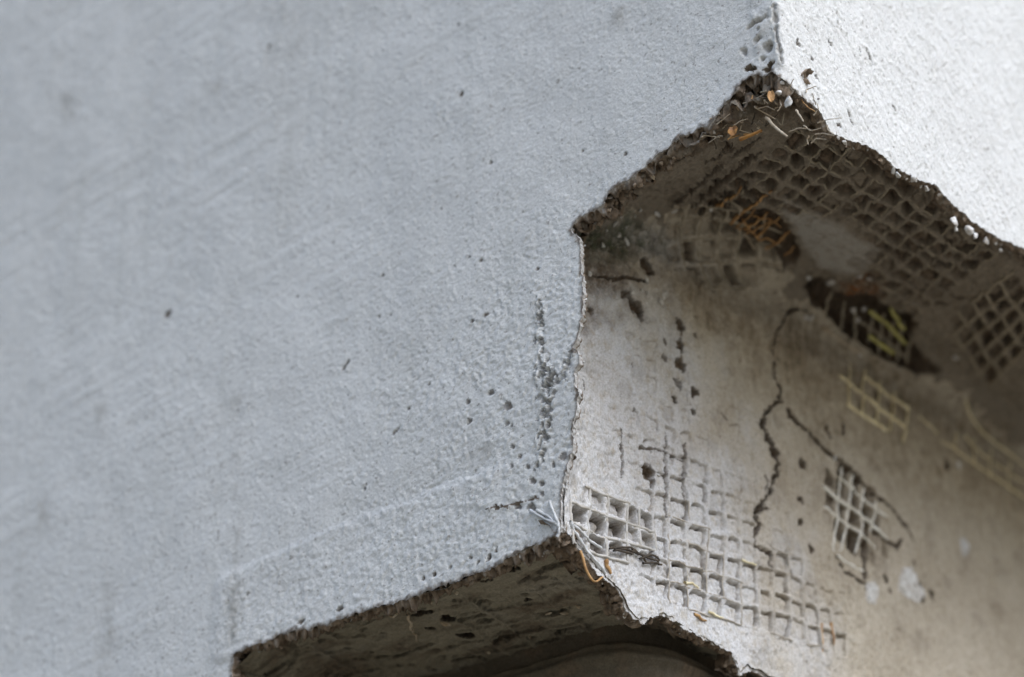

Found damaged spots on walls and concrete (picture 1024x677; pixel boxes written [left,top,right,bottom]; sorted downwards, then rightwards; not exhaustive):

flaking render [231,56,1024,677]
crack [753,308,916,590]